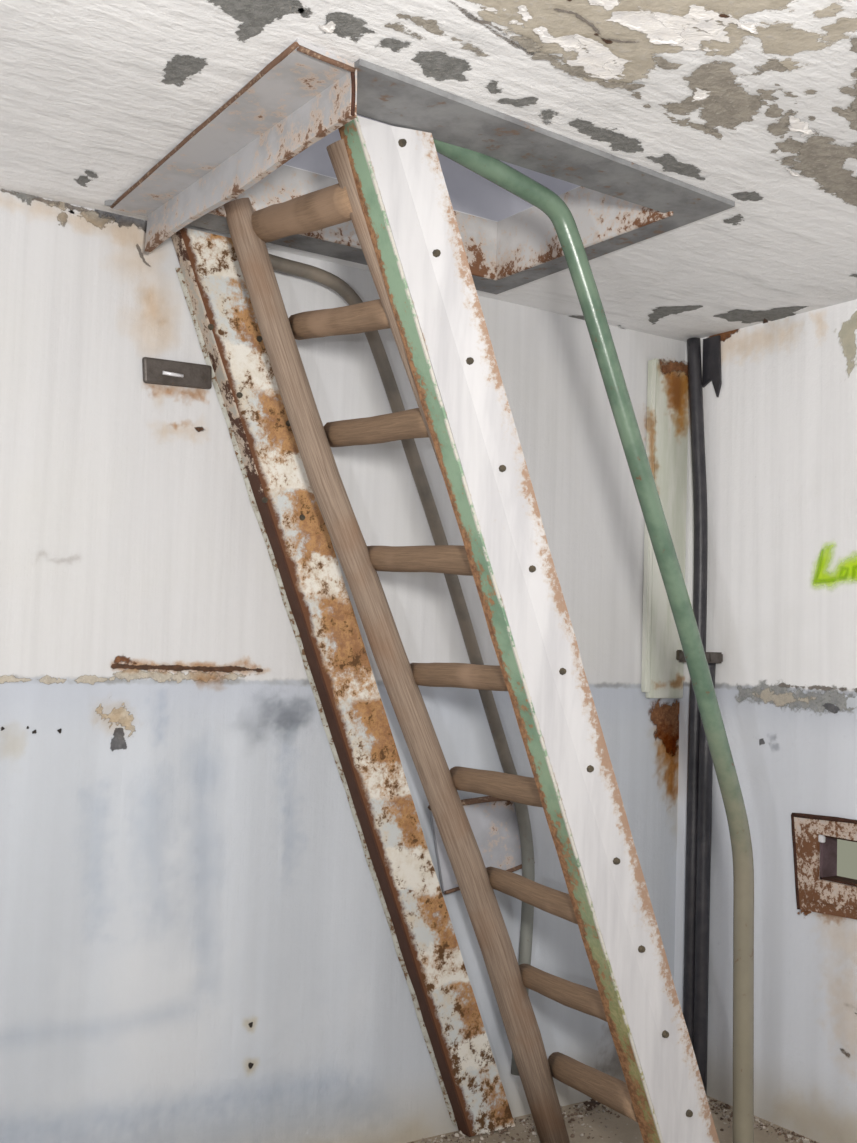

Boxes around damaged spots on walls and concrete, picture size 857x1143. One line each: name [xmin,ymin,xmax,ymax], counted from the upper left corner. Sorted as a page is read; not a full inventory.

peeling [208,0,489,81]
corrosion [110,41,356,208]
peeling [466,0,857,206]
peeling [724,191,764,225]
peeling [648,305,703,324]
peeling [713,306,809,323]
peeling [838,311,857,374]
corrosion [659,359,688,408]
flaking render [96,703,136,751]
corrosion [649,699,680,791]
flaking render [735,680,857,713]
corrosion [791,813,857,915]